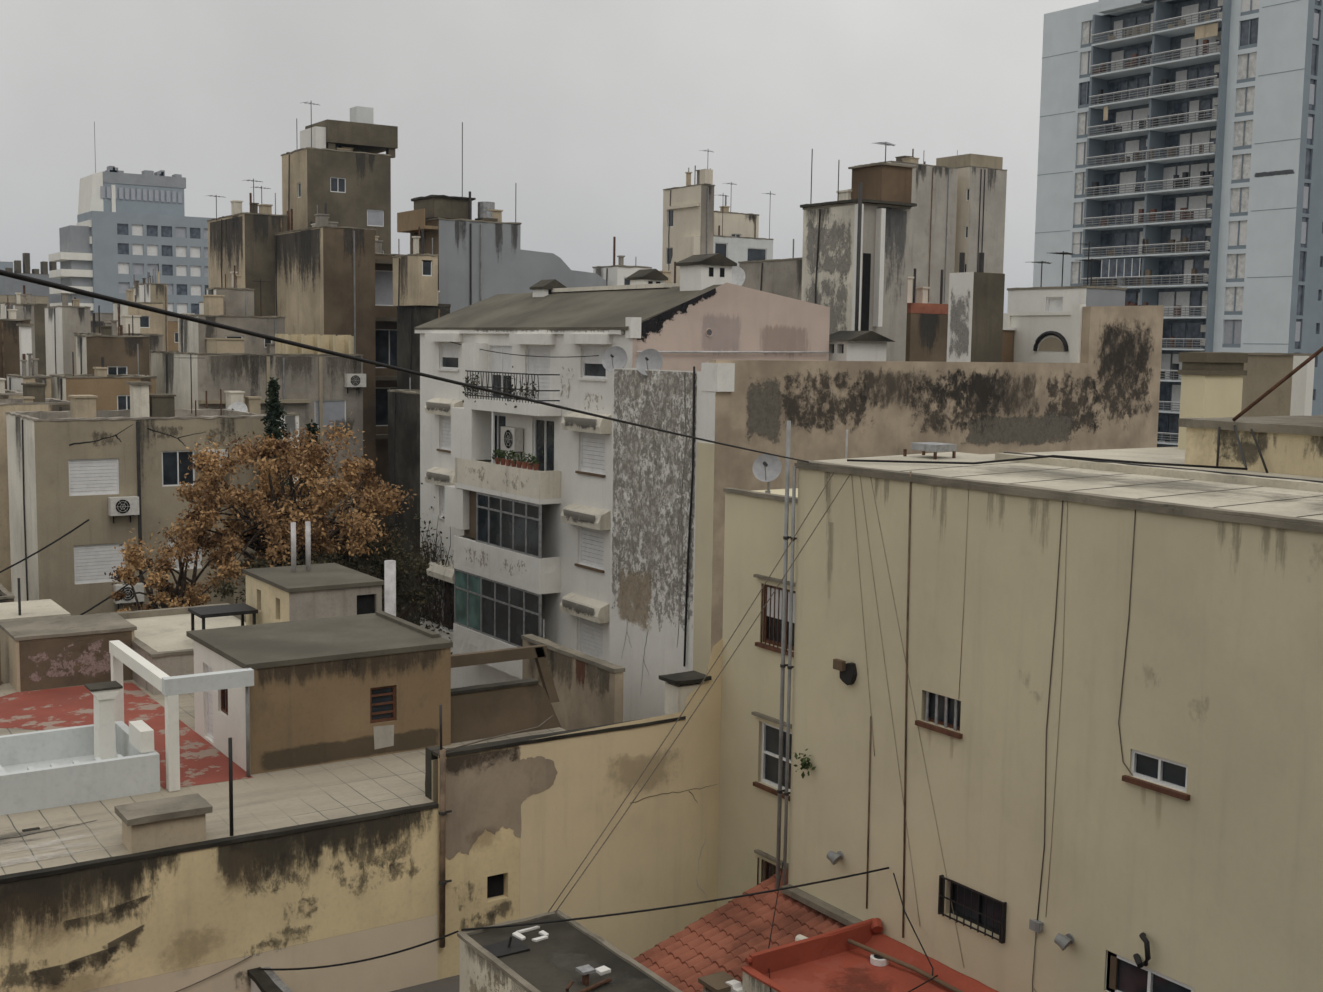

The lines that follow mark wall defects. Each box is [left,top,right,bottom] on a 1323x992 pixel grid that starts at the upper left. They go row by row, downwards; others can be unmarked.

water stain [798,207,851,335]
water stain [746,292,1152,446]
peeling [585,369,697,629]
peeling [28,639,111,682]
water stain [218,810,432,893]
spalling [445,747,558,860]
water stain [0,853,178,992]
water stain [252,899,317,949]
peeling [468,971,508,992]